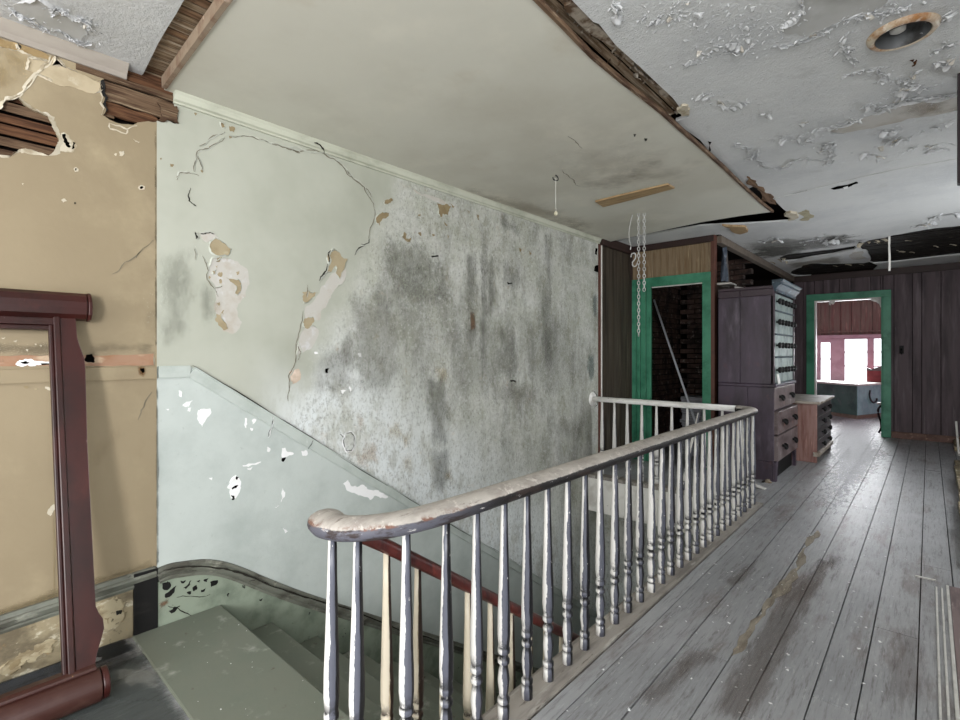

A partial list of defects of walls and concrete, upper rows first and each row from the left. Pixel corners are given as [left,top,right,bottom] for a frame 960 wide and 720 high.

peeling [4,0,102,48]
flaking render [0,39,179,143]
peeling [608,0,960,166]
flaking render [0,96,77,158]
flaking render [199,233,249,334]
crack [176,132,376,399]
flaking render [296,248,348,355]
peeling [228,462,261,500]
peeling [343,480,388,500]
peeling [99,596,127,630]
peeling [162,578,218,598]
peeling [0,639,57,676]